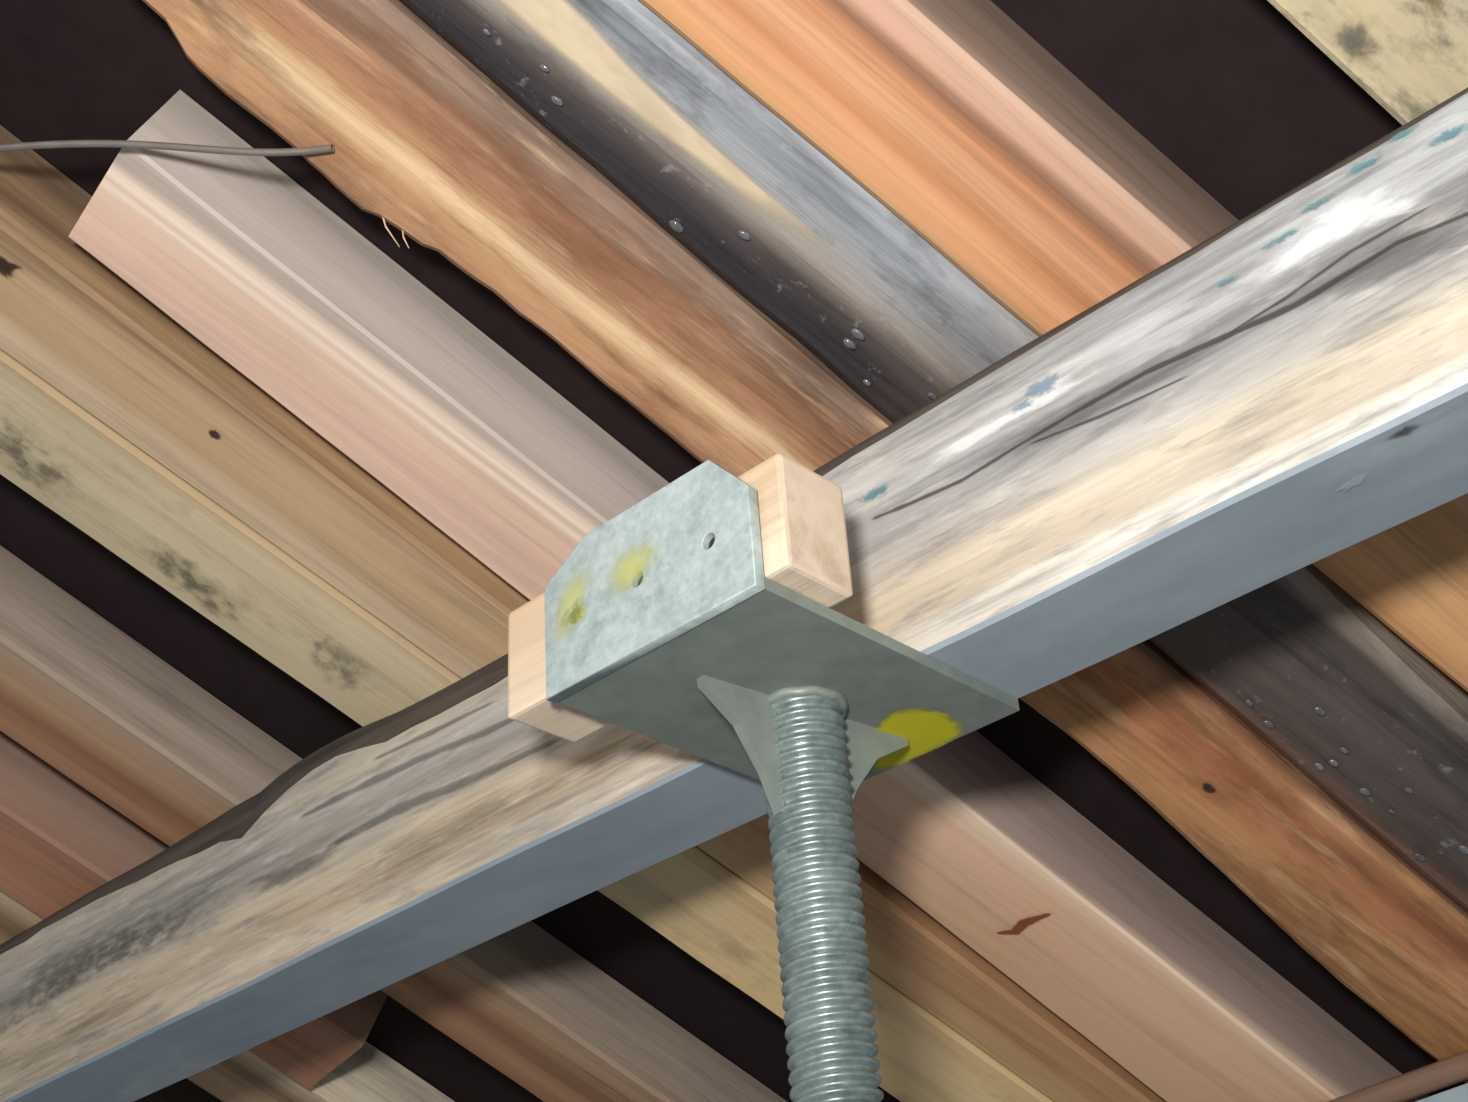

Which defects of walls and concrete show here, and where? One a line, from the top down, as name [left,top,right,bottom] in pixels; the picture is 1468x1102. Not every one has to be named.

water stain [1341,27,1368,54]
crack [873,207,1468,519]
water stain [0,440,60,480]
water stain [161,558,231,609]